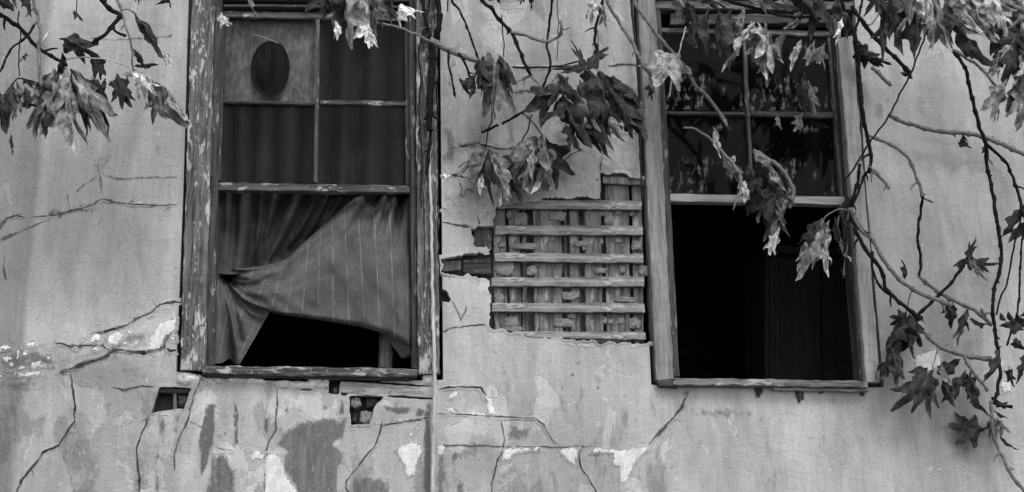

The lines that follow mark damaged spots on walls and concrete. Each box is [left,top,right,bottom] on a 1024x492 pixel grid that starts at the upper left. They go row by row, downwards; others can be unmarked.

crack [0,164,176,280]
flaking render [438,123,653,379]
peeling [0,306,180,380]
crack [14,297,182,492]
crack [170,374,205,471]
spalling [148,372,388,428]
peeling [392,416,448,479]
crack [341,383,599,492]
peeling [556,444,650,488]
crack [647,391,689,445]